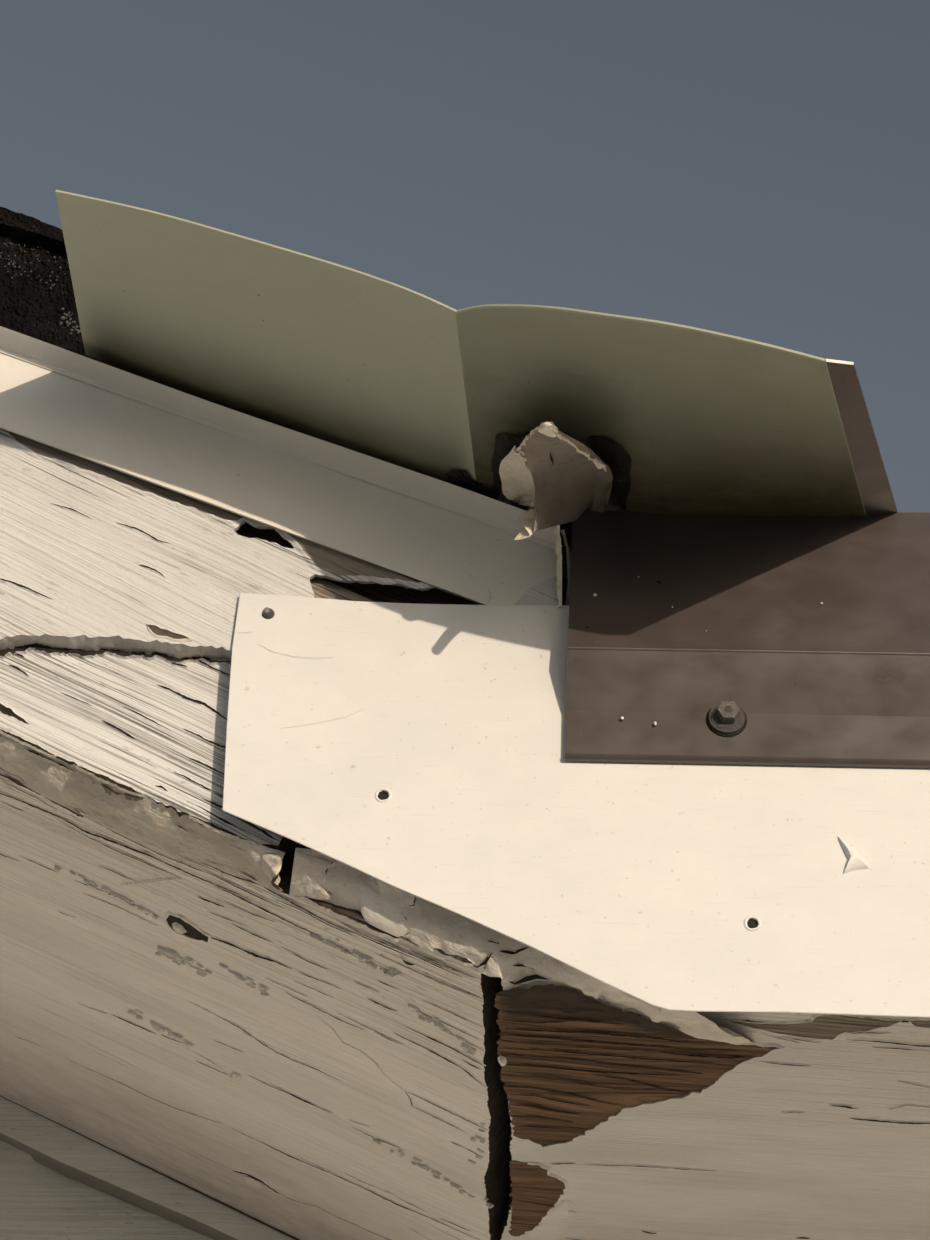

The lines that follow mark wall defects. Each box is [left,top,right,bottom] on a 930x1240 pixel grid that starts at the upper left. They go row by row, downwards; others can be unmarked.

peeling [538,425,558,437]
peeling [0,428,436,589]
peeling [146,623,193,643]
peeling [261,853,282,881]
peeling [296,851,336,900]
peeling [356,875,417,938]
crack [0,643,930,1155]
peeling [494,980,930,1148]
crack [550,1161,717,1171]
peeling [508,1161,569,1237]